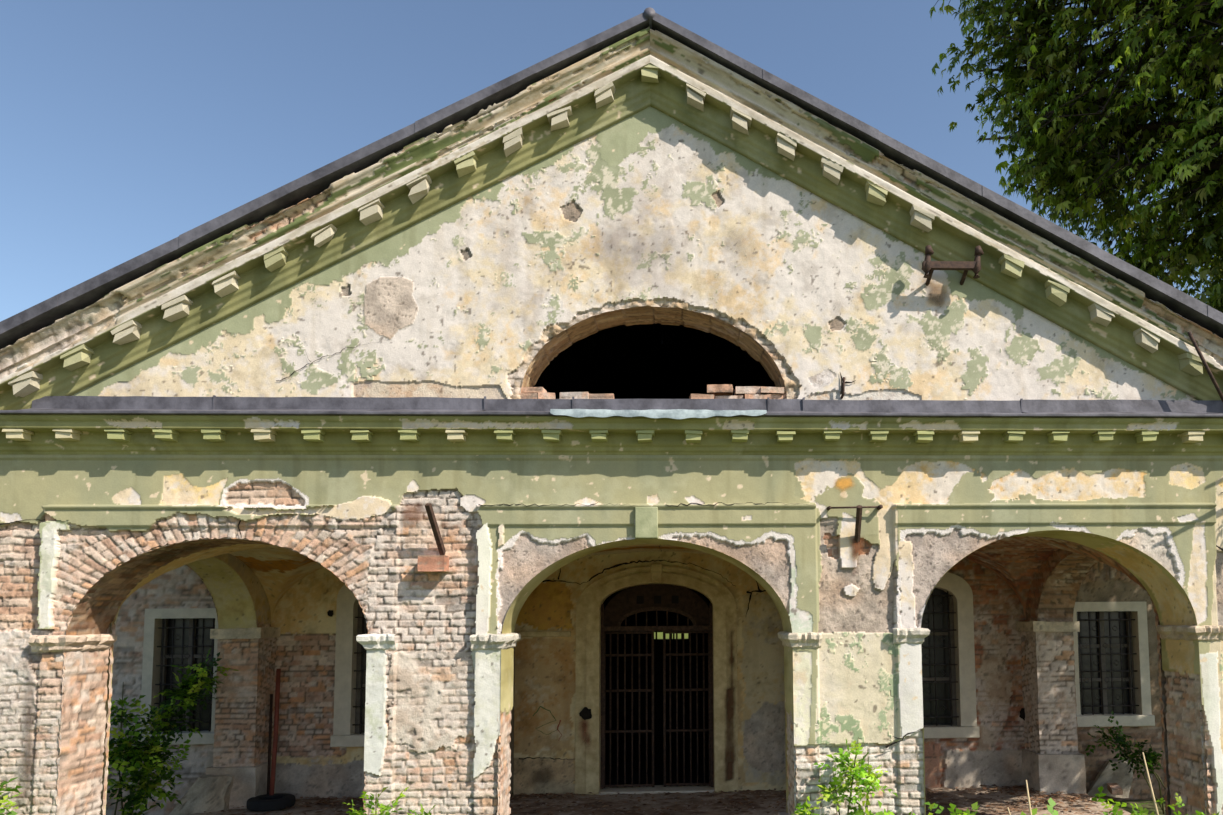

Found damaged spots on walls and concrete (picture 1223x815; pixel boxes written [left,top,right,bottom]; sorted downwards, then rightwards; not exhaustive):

peeling [0,26,1223,413]
peeling [104,416,163,428]
peeling [244,416,301,429]
peeling [400,418,574,429]
peeling [723,419,755,430]
peeling [829,419,869,430]
peeling [900,420,962,431]
peeling [1126,420,1180,431]
crack [542,546,766,614]
peeling [659,458,1223,815]
flaking render [0,473,635,815]